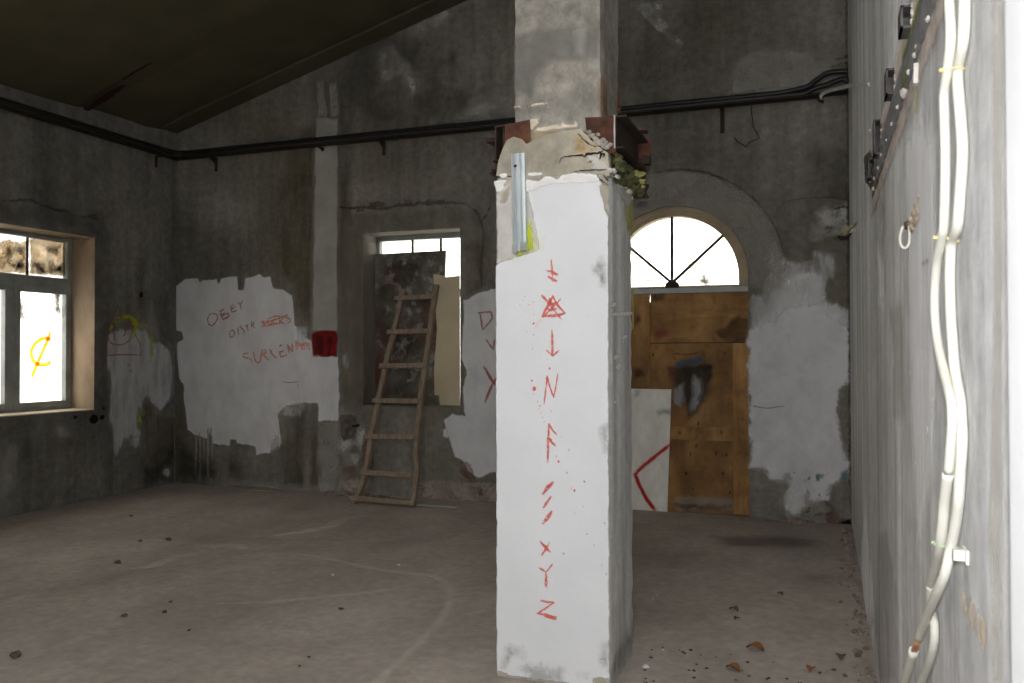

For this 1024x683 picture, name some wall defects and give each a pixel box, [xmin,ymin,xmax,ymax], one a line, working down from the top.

peeling [494,173,509,203]
spalling [526,152,646,201]